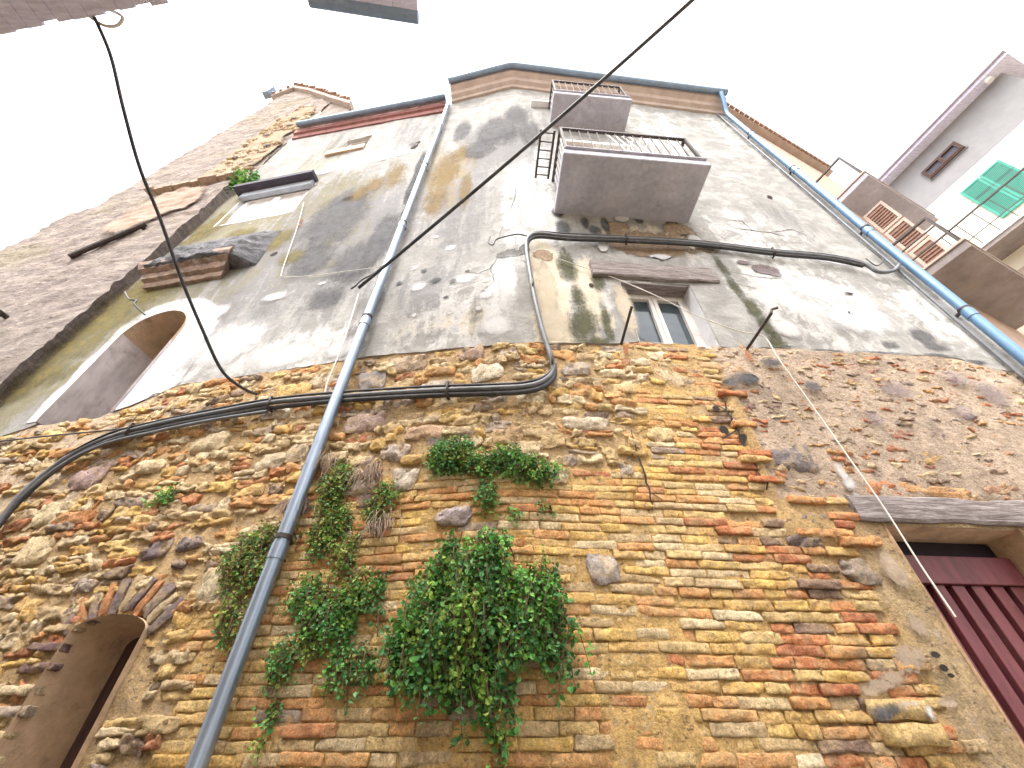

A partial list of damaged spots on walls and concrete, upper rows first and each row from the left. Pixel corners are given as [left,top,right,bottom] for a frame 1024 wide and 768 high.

spalling [203,105,315,176]
leakage [455,122,491,157]
leakage [280,149,426,308]
spalling [597,217,720,259]
leakage [264,292,286,301]
leakage [454,274,476,283]
leakage [591,277,605,290]
leakage [192,305,352,370]
leakage [569,304,614,343]